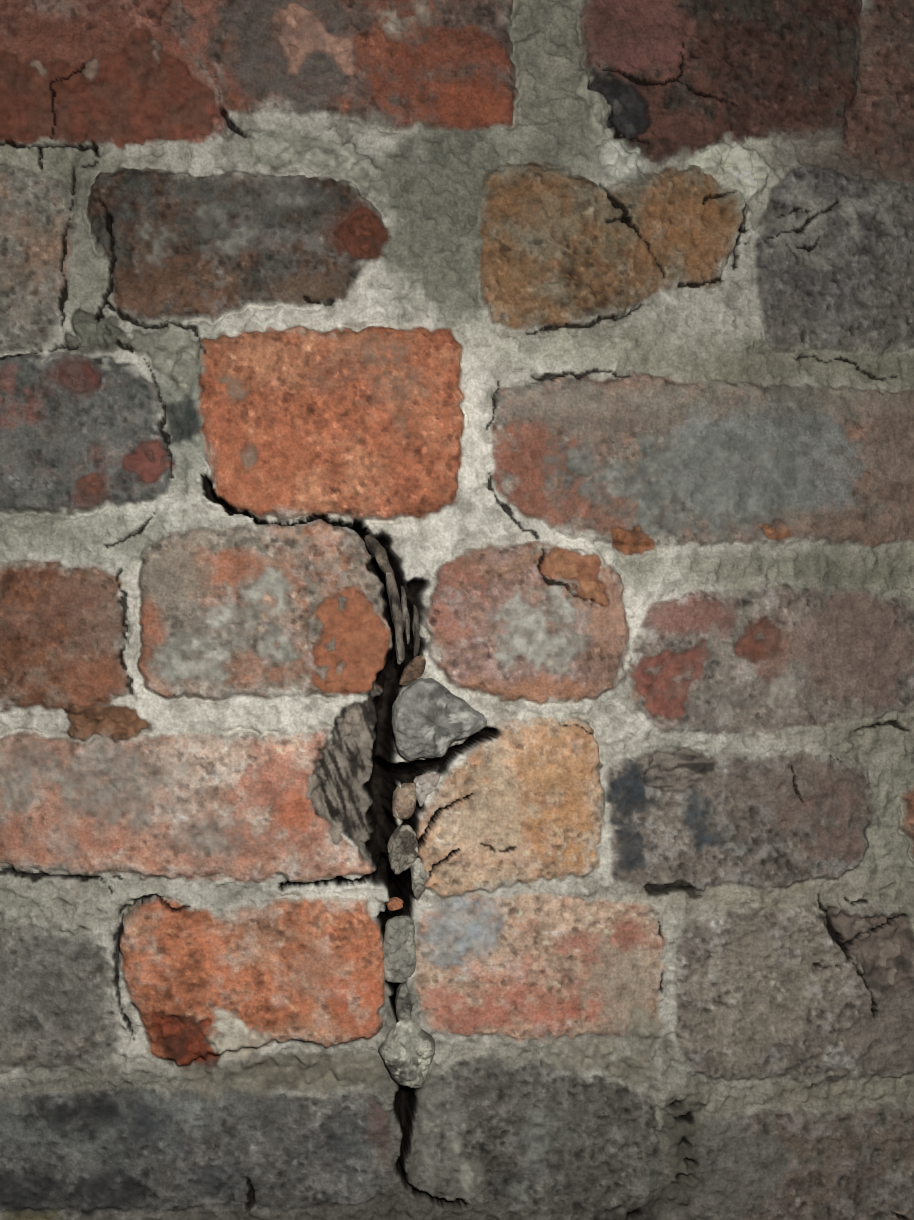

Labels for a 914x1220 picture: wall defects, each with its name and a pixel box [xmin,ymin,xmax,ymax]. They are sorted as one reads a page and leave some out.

crack [599,184,838,288]
crack [526,304,641,335]
crack [0,64,516,936]
crack [488,473,594,601]
crack [386,980,401,1022]
crack [812,895,906,1015]
crack [246,1177,255,1211]
crack [394,1084,466,1206]